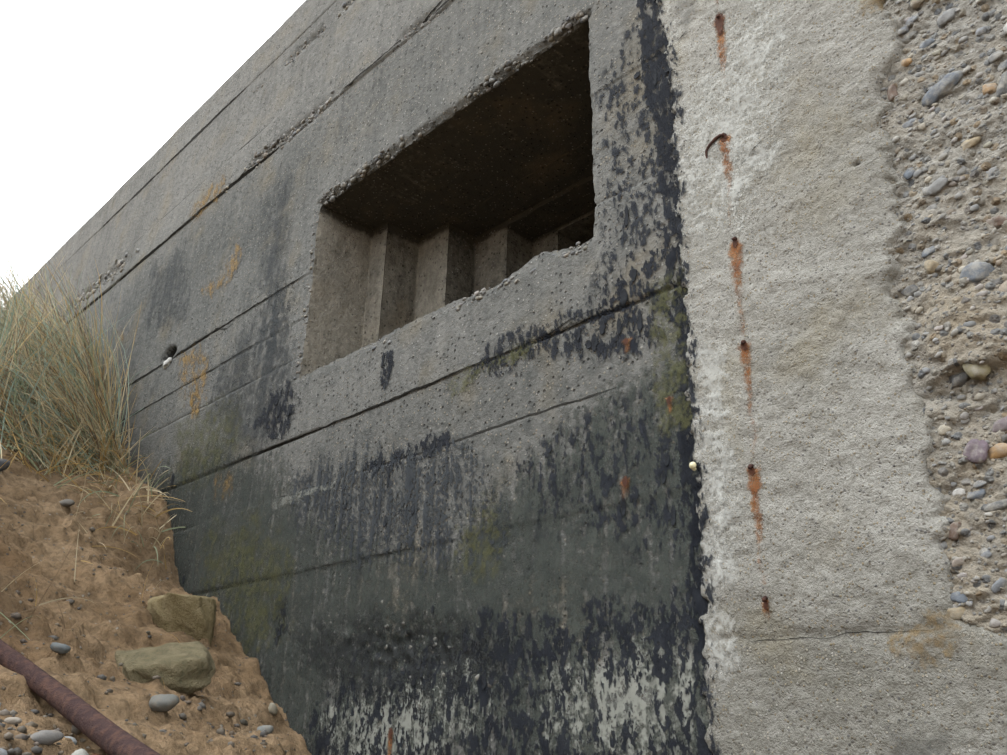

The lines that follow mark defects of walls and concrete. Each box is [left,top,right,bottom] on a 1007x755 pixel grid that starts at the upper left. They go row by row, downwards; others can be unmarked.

rust [713,13,725,61]
rust [705,133,731,190]
rust [728,236,744,328]
spalling [880,0,1007,638]
rust [739,340,752,410]
leakage [148,184,709,755]
rust [746,464,762,529]